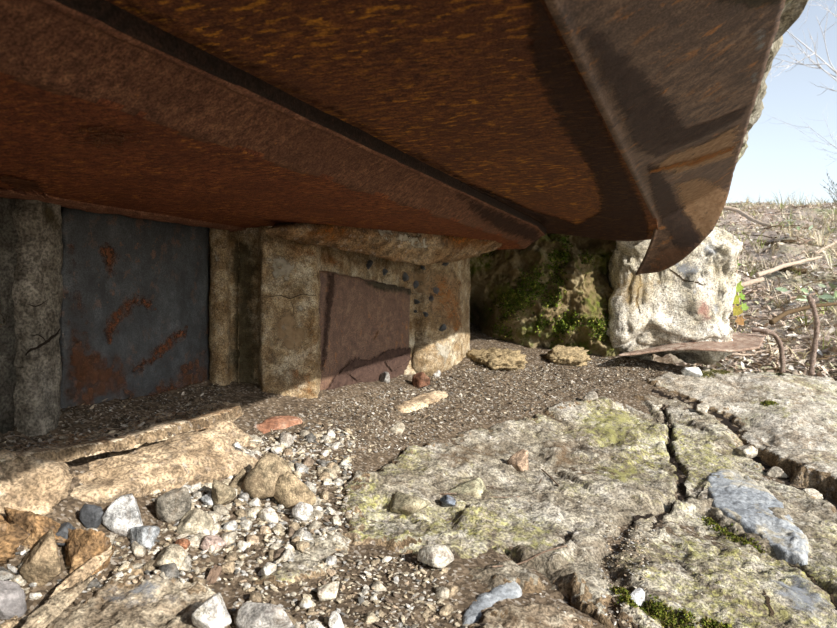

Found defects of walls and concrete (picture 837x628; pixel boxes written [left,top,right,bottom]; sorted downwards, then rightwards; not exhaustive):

corrosion [650,126,739,240]
corrosion [651,248,692,271]
crack [25,329,61,356]